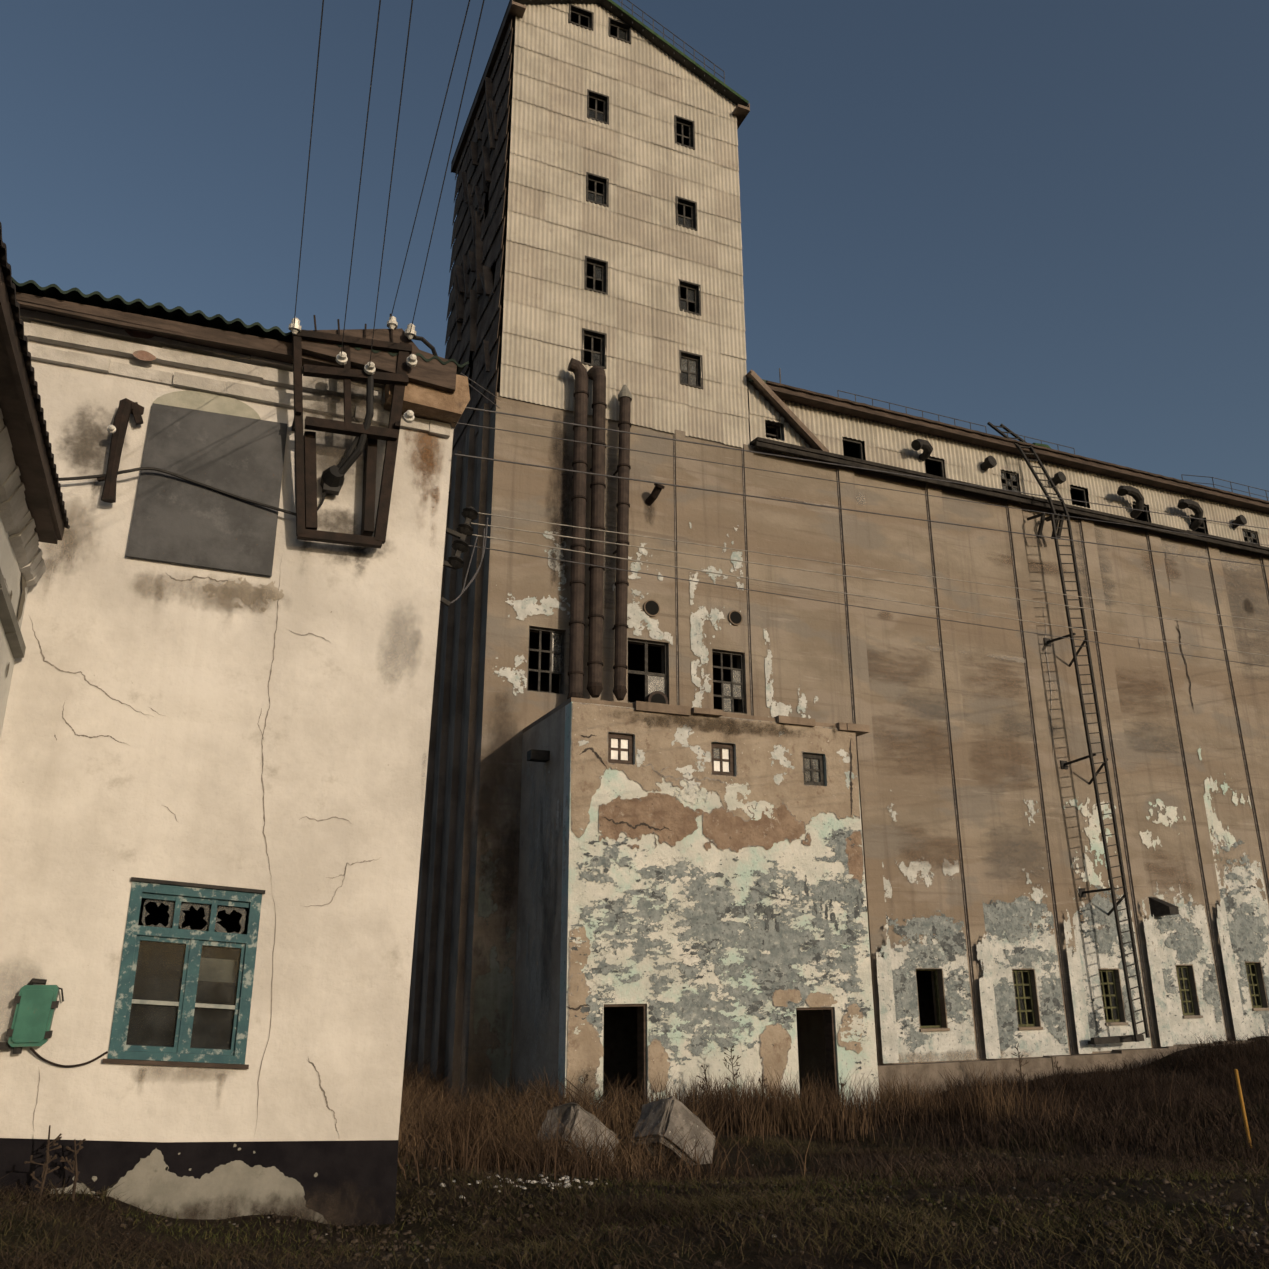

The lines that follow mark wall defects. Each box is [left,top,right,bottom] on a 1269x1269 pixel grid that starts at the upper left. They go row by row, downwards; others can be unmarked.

crack [29,616,165,746]
peeling [493,655,527,696]
peeling [505,531,570,621]
crack [1166,549,1195,713]
crack [255,559,381,1134]
peeling [882,856,974,1056]
peeling [982,867,1069,1056]
peeling [1083,974,1103,1047]
peeling [1063,797,1143,1035]
peeling [1151,896,1222,1024]
peeling [1203,773,1269,1031]
peeling [51,1144,328,1235]